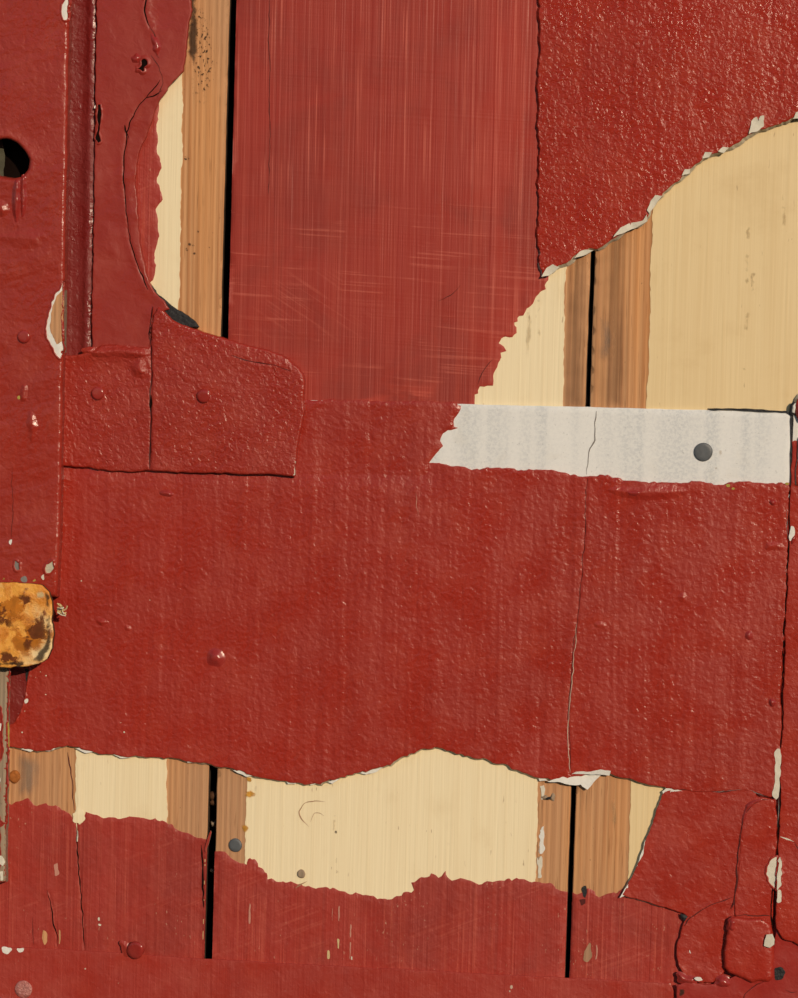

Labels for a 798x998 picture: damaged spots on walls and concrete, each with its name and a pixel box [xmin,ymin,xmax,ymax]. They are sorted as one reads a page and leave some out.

peeling [749,115,764,134]
peeling [44,281,66,361]
crack [123,0,163,469]
peeling [152,286,199,327]
peeling [542,264,559,277]
peeling [614,195,662,237]
crack [567,411,597,769]
corrosion [0,596,50,667]
crack [679,490,798,927]
peeling [0,667,11,881]
peeling [537,785,545,878]